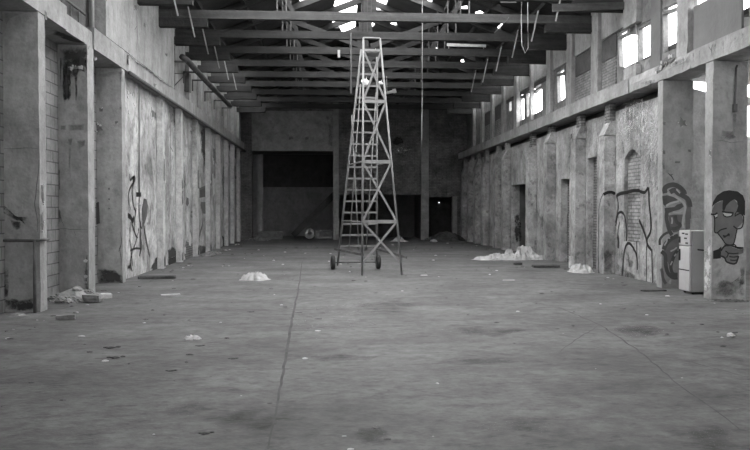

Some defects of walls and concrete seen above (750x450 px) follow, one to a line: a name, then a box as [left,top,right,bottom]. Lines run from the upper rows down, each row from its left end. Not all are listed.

damp [60,59,77,100]
crack [247,264,303,449]